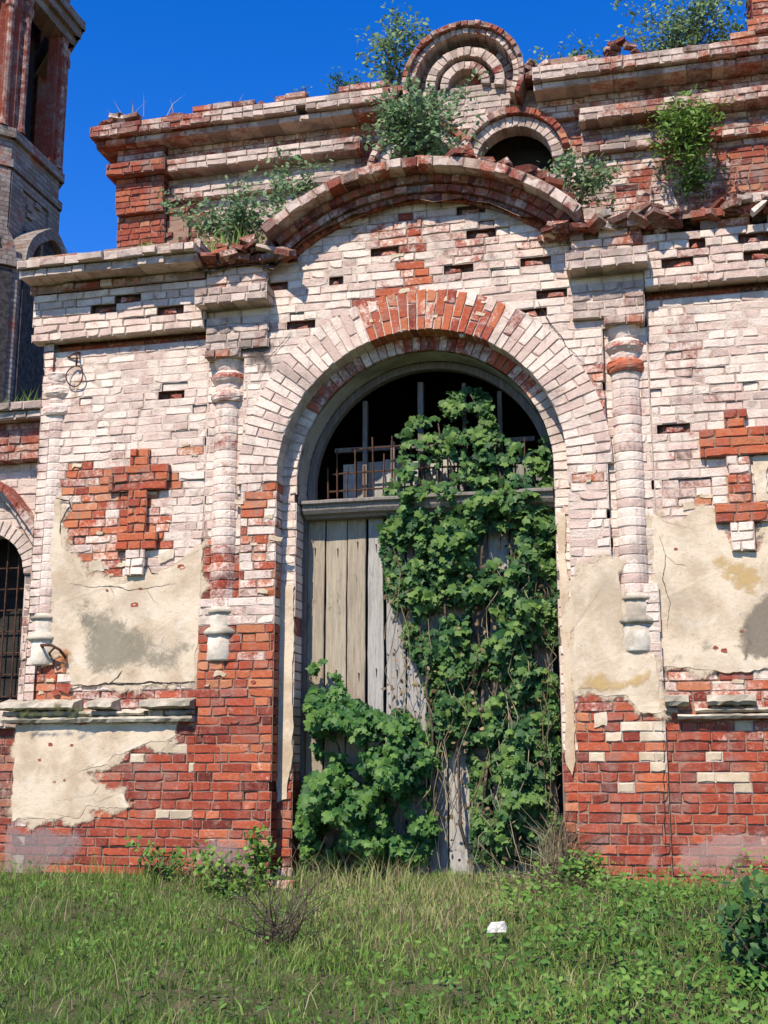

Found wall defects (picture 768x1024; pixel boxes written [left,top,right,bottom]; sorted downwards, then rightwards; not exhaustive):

flaking render [752,455,768,502]
crack [75,565,175,601]
water stain [82,613,185,672]
flaking render [33,462,295,802]
flaking render [556,493,768,776]
water stain [738,595,768,658]
flaking render [7,716,194,830]
flaking render [619,783,634,792]
flaking render [697,752,752,793]